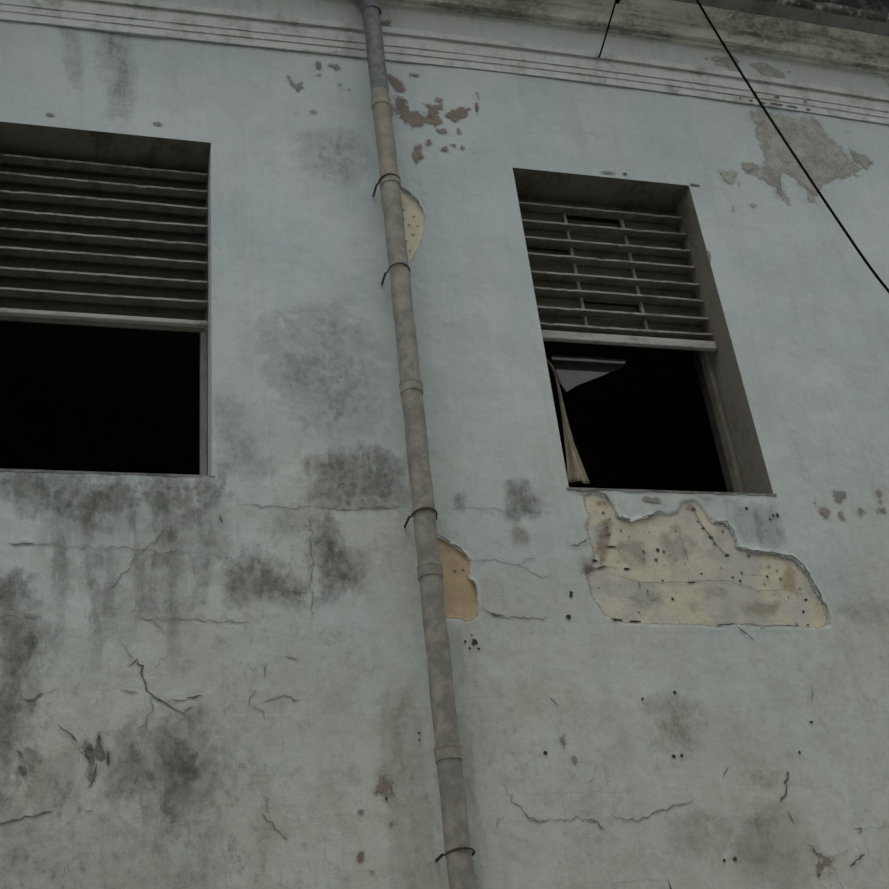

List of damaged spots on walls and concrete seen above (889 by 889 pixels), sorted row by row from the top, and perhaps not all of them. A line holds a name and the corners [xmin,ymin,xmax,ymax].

peeling [387,73,479,164]
peeling [719,92,873,205]
flaking render [400,185,427,263]
peeling [812,491,847,521]
crack [8,523,195,592]
crack [139,616,251,633]
crack [226,504,406,617]
flaking render [437,532,483,621]
crack [484,610,548,620]
flaking render [570,489,834,641]
crack [122,644,203,730]
crack [495,783,693,830]